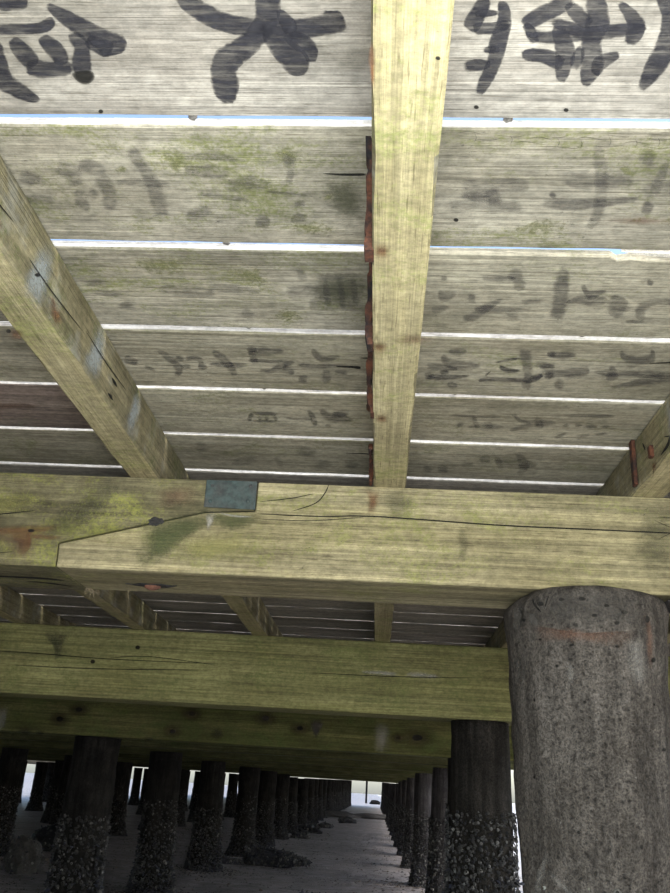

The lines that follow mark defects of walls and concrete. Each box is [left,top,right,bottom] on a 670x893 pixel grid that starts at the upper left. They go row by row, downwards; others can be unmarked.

crack [261,485,670,534]